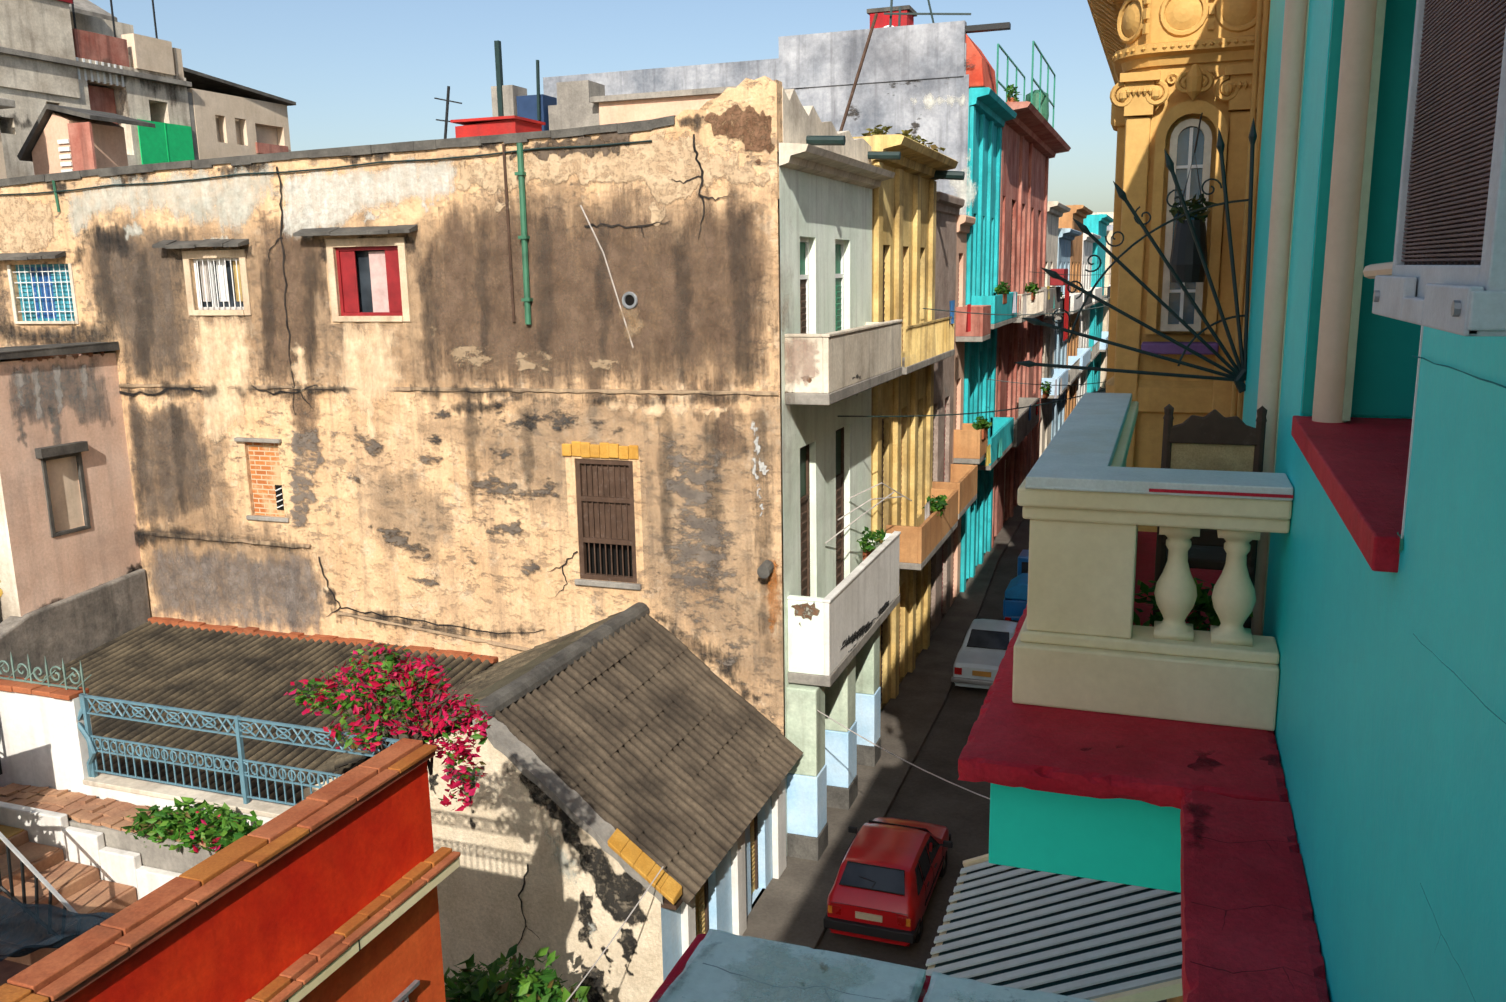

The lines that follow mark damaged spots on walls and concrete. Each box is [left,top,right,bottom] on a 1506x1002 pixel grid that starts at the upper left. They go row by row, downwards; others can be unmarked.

damp [47,181,66,196]
damp [343,152,390,165]
peeling [0,104,775,253]
crack [584,134,730,240]
damp [681,115,701,130]
crack [119,166,351,415]
damp [785,339,818,382]
crack [1412,355,1506,388]
damp [0,217,524,638]
damp [403,195,769,700]
crack [1413,633,1506,724]
crack [514,864,540,955]